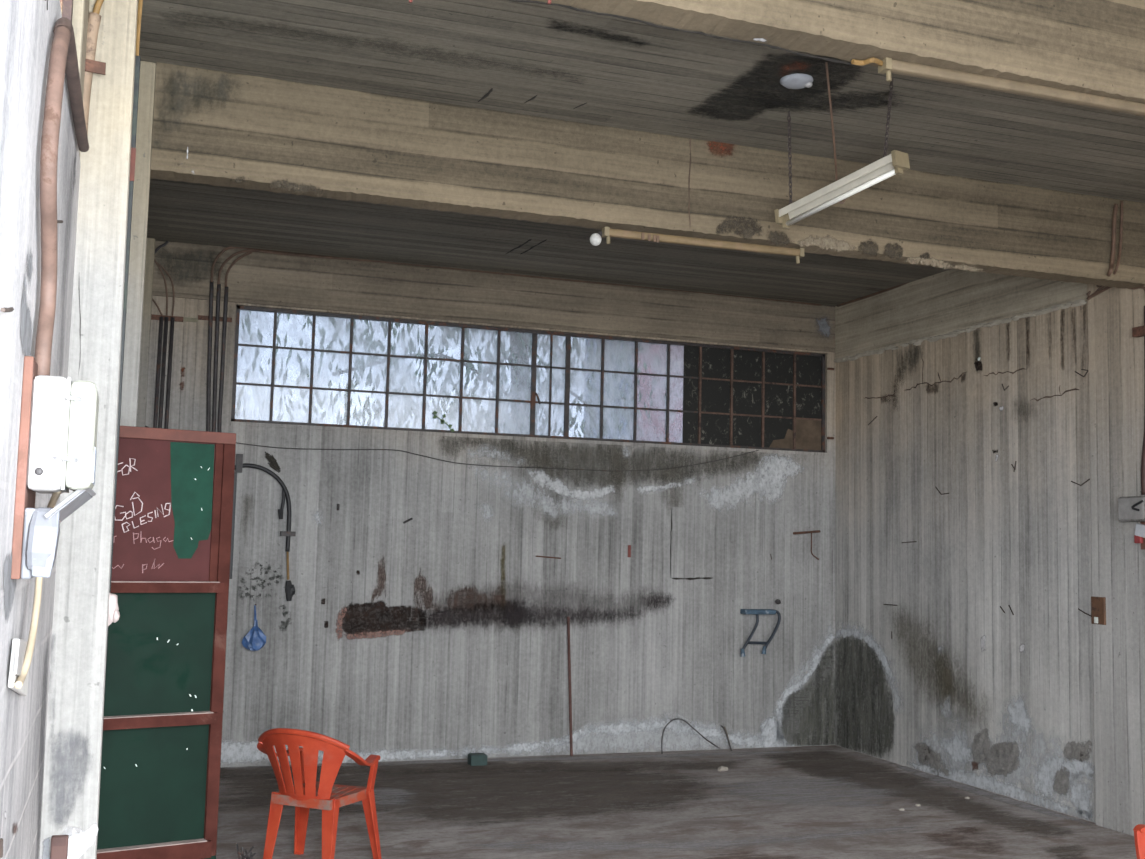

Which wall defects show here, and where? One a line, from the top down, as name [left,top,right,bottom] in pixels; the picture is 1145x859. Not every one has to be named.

damp [689,54,895,121]
rust [707,141,735,156]
spalling [716,216,983,271]
damp [444,438,804,519]
damp [414,570,507,612]
damp [219,741,294,806]
damp [334,625,1094,853]
spalling [915,743,949,776]
spalling [971,729,1019,776]
spalling [1053,742,1092,795]